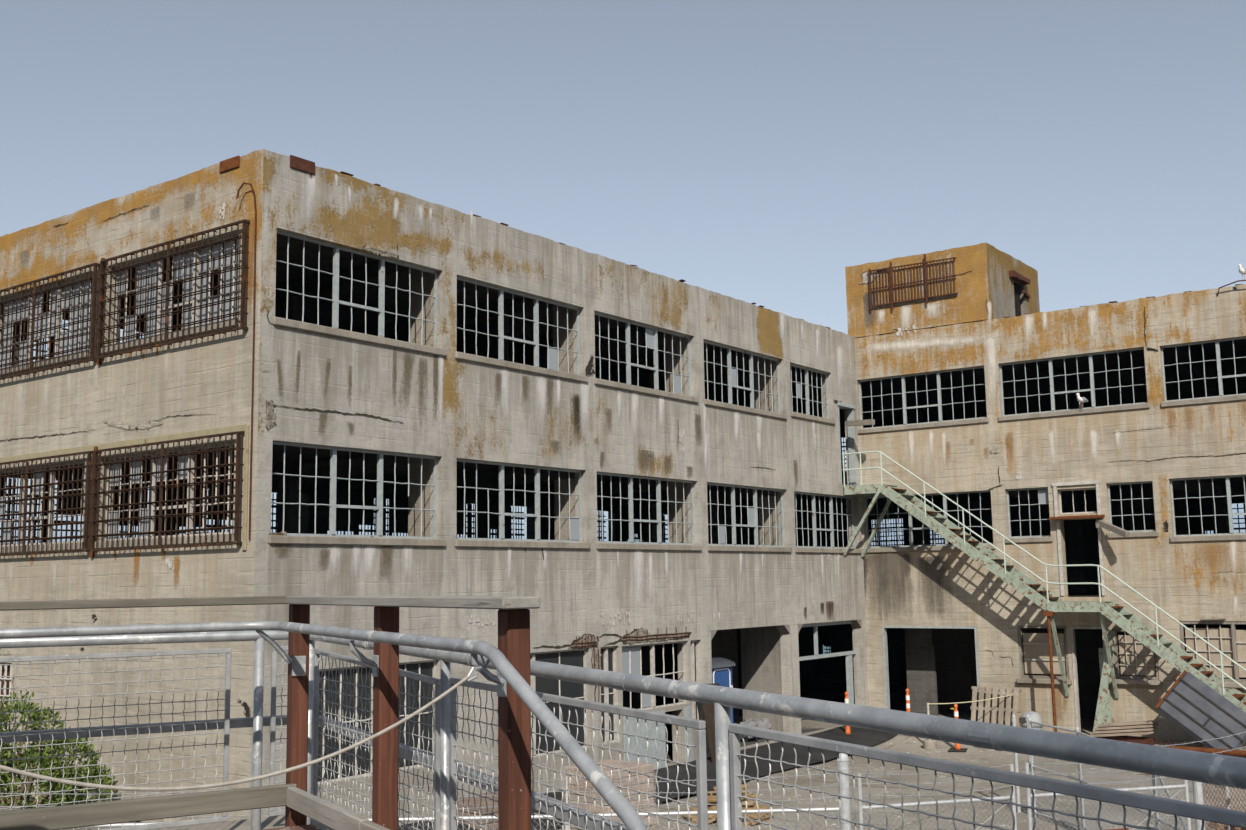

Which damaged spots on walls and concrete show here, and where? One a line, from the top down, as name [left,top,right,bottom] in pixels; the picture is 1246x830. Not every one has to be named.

water stain [865,292,885,324]
water stain [1025,311,1047,339]
water stain [1089,309,1097,335]
water stain [873,301,997,400]
crack [276,405,403,423]
water stain [929,430,946,464]
water stain [1090,429,1099,458]
corrosion [162,548,179,579]